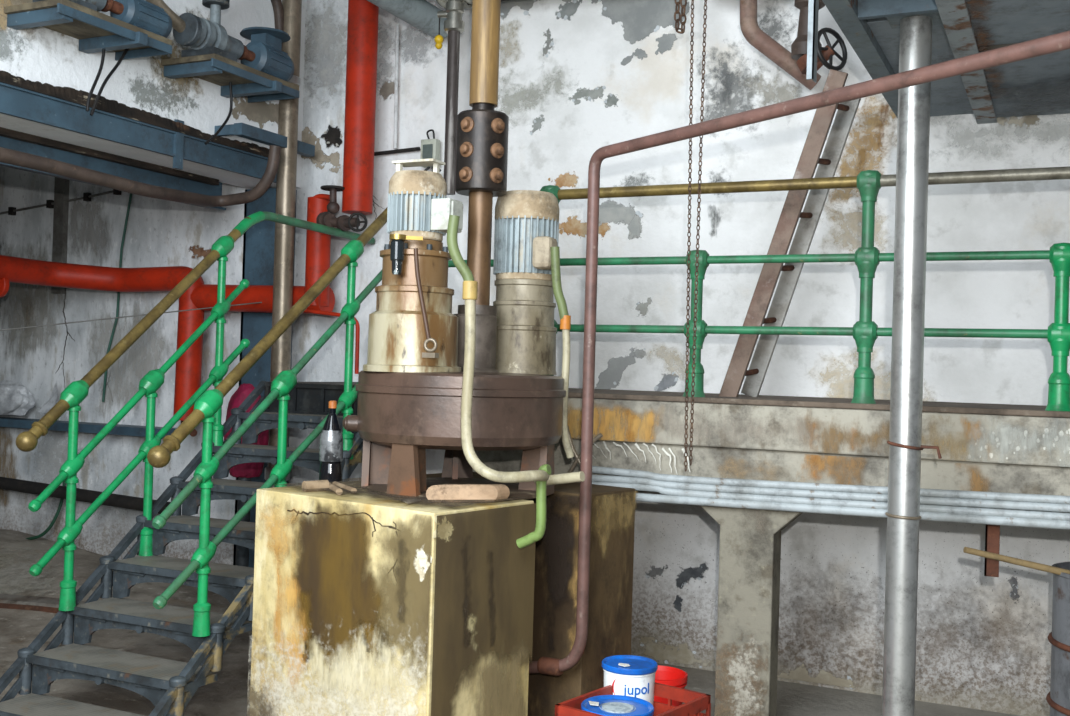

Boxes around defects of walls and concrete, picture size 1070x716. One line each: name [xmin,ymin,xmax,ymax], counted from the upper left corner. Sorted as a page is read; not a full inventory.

water stain [0,0,36,59]
spalling [500,0,540,19]
spalling [555,0,690,65]
rust [966,0,995,52]
spalling [569,86,619,107]
spalling [559,200,643,240]
rust [805,419,889,485]
crack [287,509,396,537]
water stain [591,491,637,554]
water stain [247,504,421,716]
spalling [645,563,708,612]
water stain [479,648,526,716]